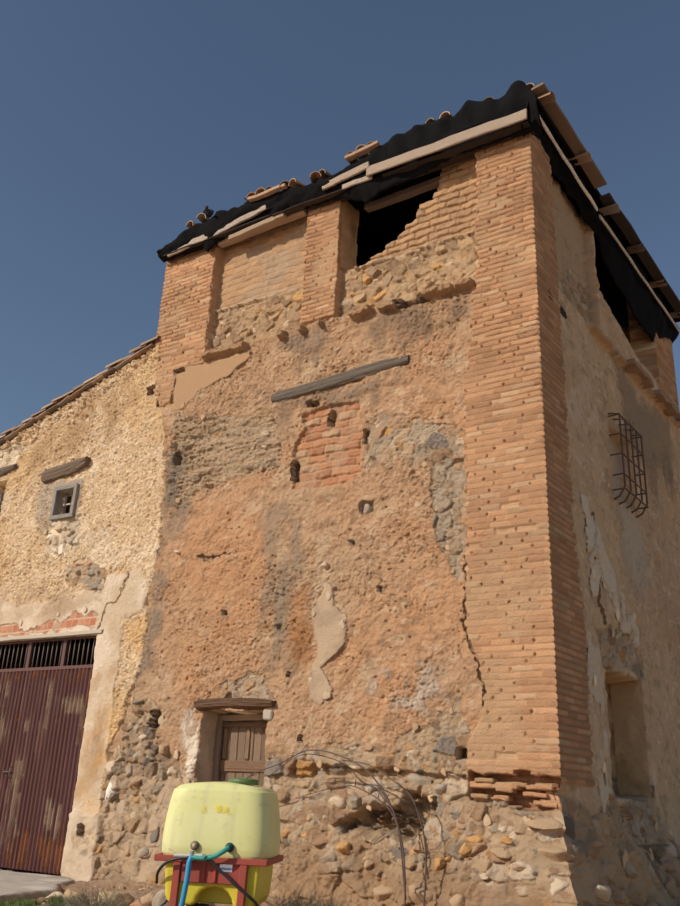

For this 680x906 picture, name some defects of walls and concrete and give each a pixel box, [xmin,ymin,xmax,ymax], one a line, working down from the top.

peeling [0,606,98,637]
peeling [308,582,348,706]
crack [460,555,487,707]
rust [4,824,65,873]
flaking render [92,696,190,884]
flaking render [290,698,562,811]